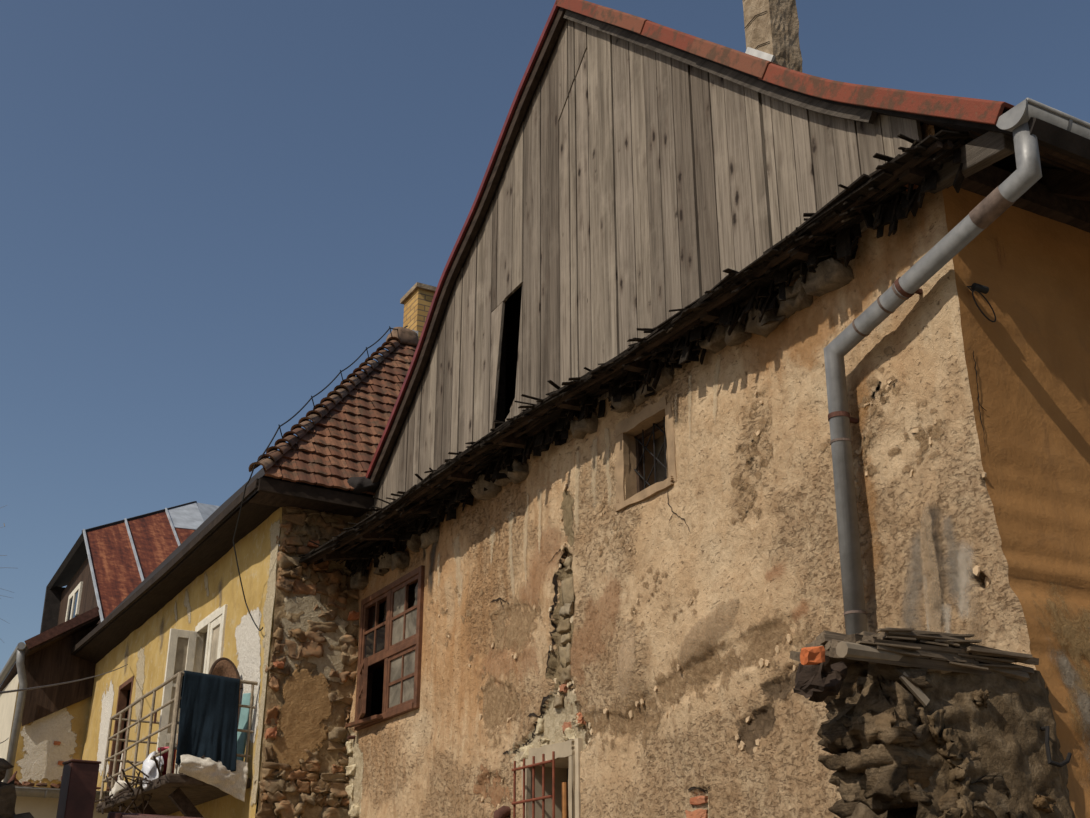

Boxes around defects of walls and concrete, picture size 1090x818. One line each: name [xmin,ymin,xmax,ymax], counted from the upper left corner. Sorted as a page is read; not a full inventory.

flaking render [16,708,77,784]
flaking render [235,520,349,806]
spalling [344,729,364,818]
spalling [468,483,813,769]